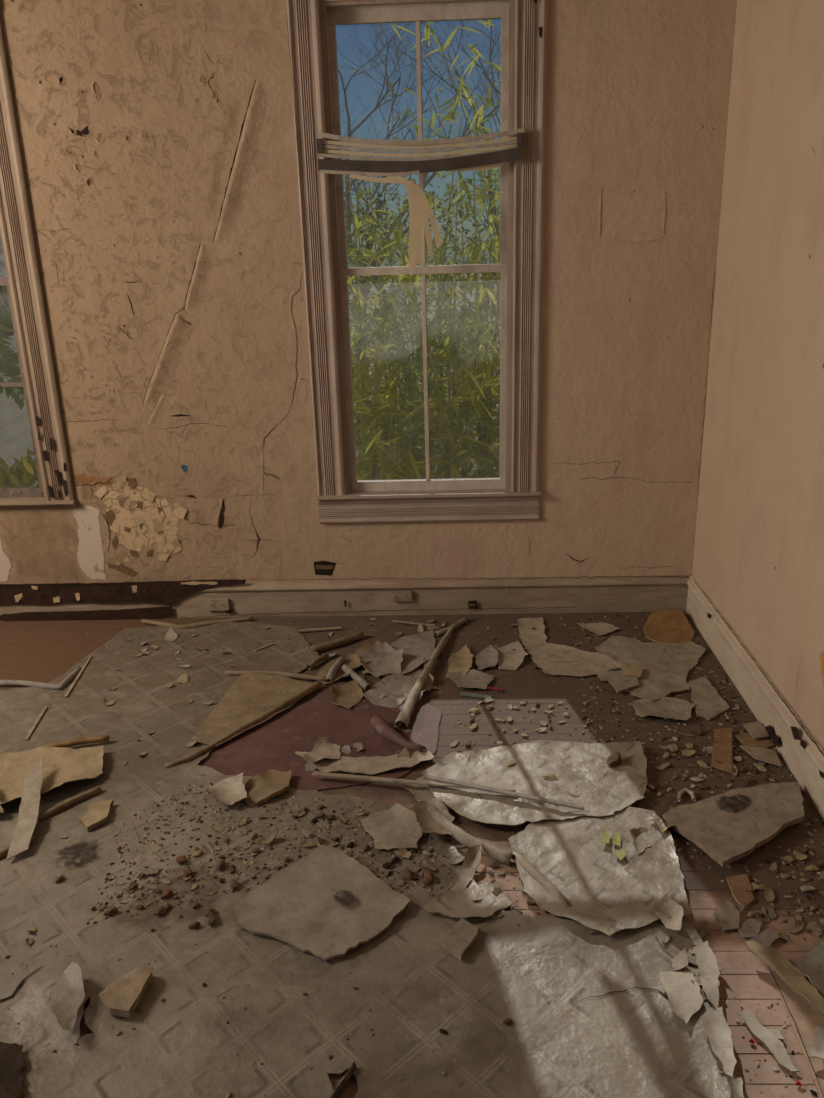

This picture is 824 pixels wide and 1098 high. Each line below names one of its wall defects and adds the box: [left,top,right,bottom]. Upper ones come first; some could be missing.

crack [235,14,320,558]
crack [554,271,716,496]
peeling [35,416,68,498]
peeling [0,475,246,621]
peeling [766,725,780,747]
peeling [790,726,805,749]